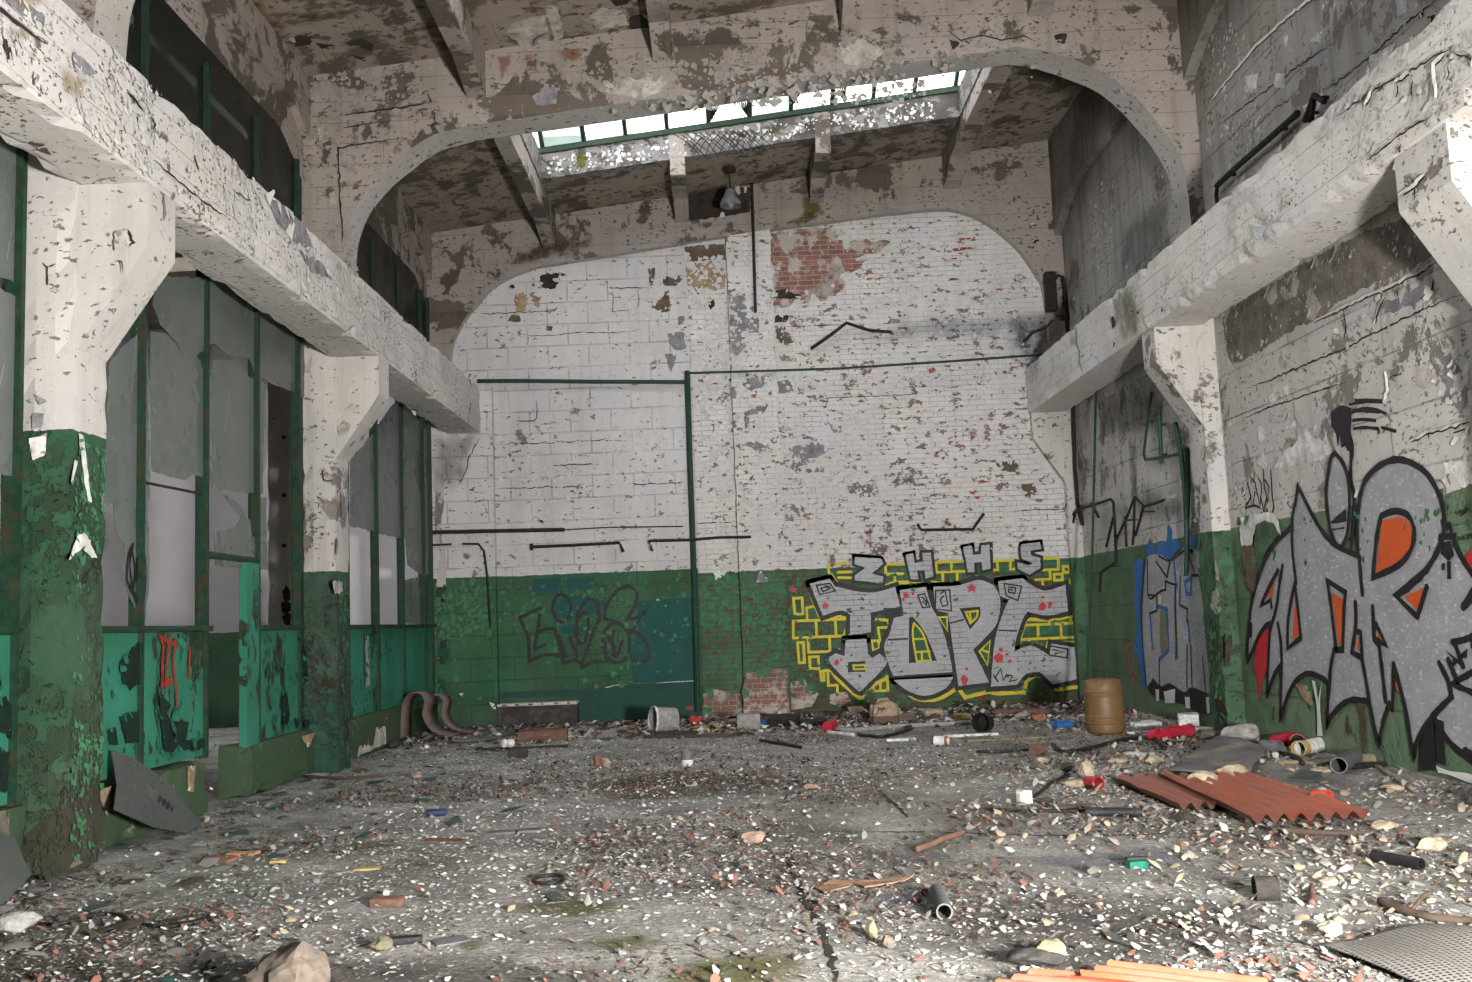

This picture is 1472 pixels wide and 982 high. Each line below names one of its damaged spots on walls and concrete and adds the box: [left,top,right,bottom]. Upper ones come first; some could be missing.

peeling [0,0,481,430]
peeling [584,0,648,30]
peeling [507,5,1017,174]
peeling [998,0,1472,413]
peeling [0,225,1472,982]